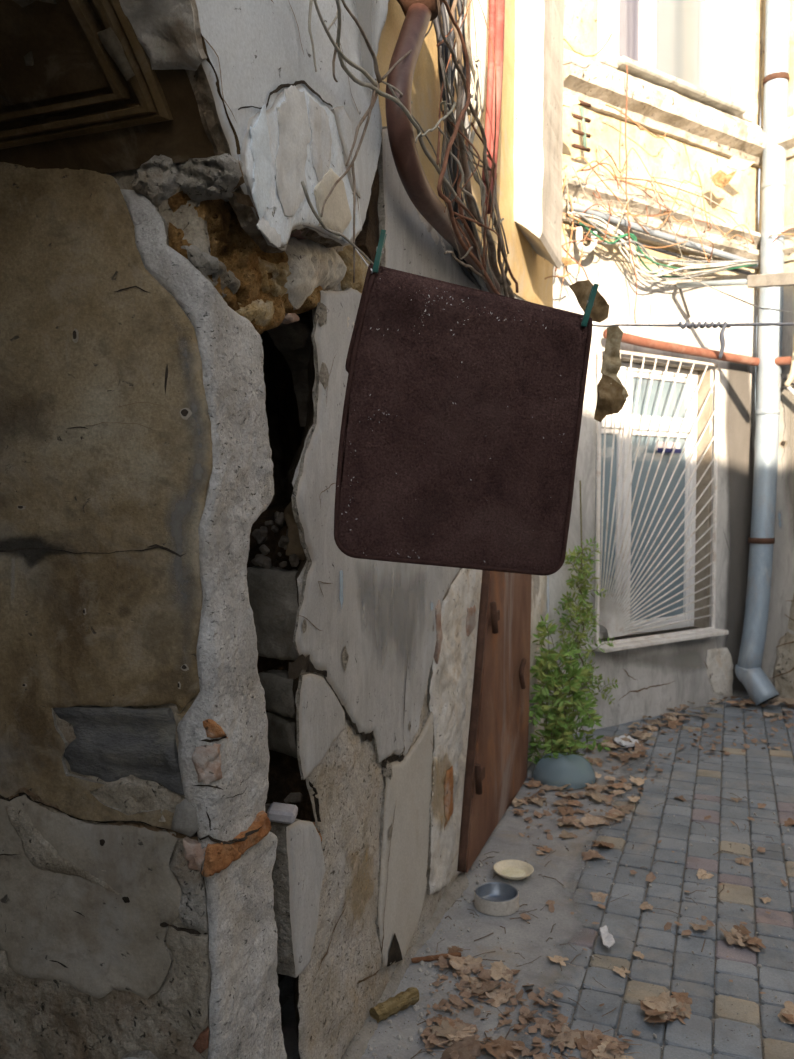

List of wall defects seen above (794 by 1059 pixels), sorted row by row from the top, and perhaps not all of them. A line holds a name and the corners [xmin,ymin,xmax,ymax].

crack [201,0,361,118]
crack [232,158,270,243]
spalling [95,85,370,1059]
crack [0,342,405,984]
spalling [770,594,794,700]
spalling [5,806,123,896]